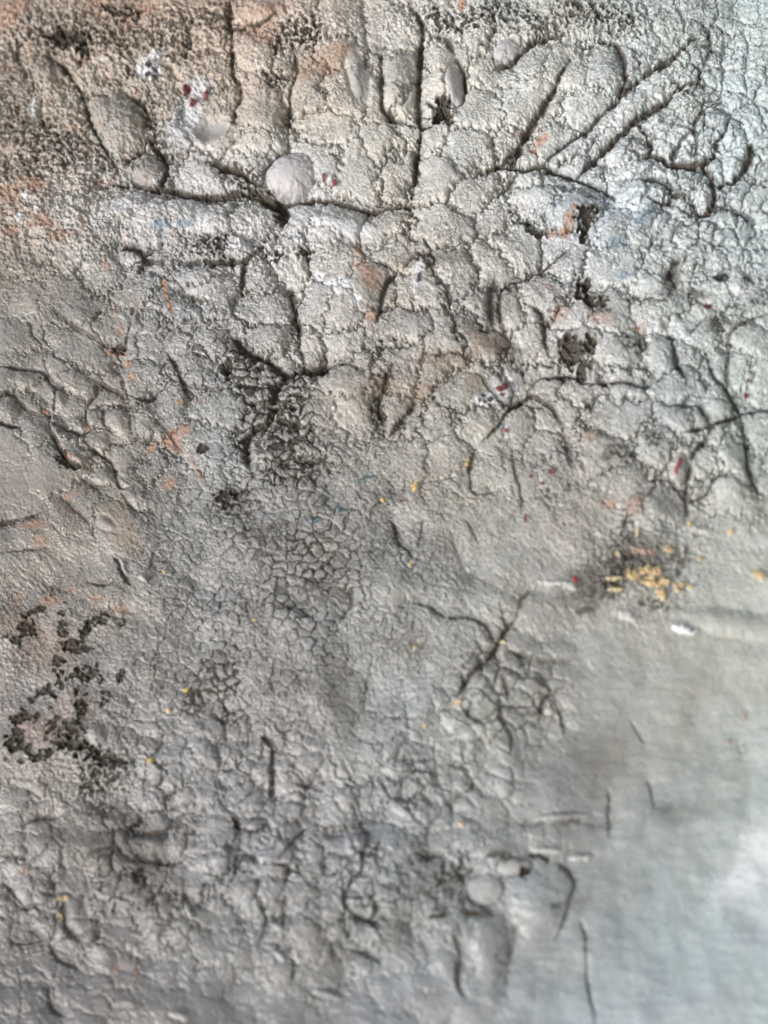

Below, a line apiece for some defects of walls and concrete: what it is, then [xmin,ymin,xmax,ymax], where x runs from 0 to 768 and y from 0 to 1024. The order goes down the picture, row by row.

crack [15,1,467,227]
crack [481,35,752,223]
crack [0,367,181,489]
crack [121,246,264,304]
crack [224,292,415,477]
crack [375,276,397,323]
spalling [559,332,597,383]
spalling [574,277,610,310]
crack [468,244,768,530]
spalling [4,601,127,767]
crack [433,609,546,714]
crack [261,736,274,798]